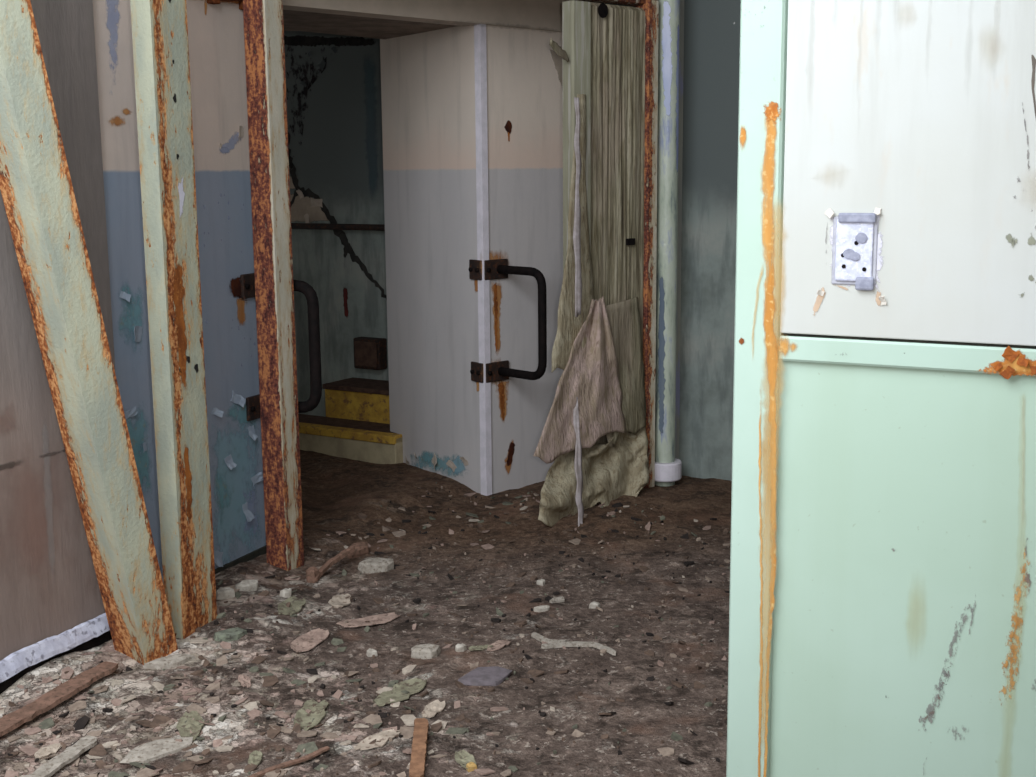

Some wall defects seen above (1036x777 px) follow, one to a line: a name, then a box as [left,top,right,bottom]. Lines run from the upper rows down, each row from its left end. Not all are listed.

peeling [107,0,119,66]
rust [110,109,130,126]
crack [288,133,387,301]
rust [173,265,187,387]
rust [979,346,1036,379]
rust [498,381,509,420]
rust [184,447,192,521]
peeling [212,391,263,567]
peeling [405,452,468,475]
rust [505,441,515,474]
rust [758,102,796,777]